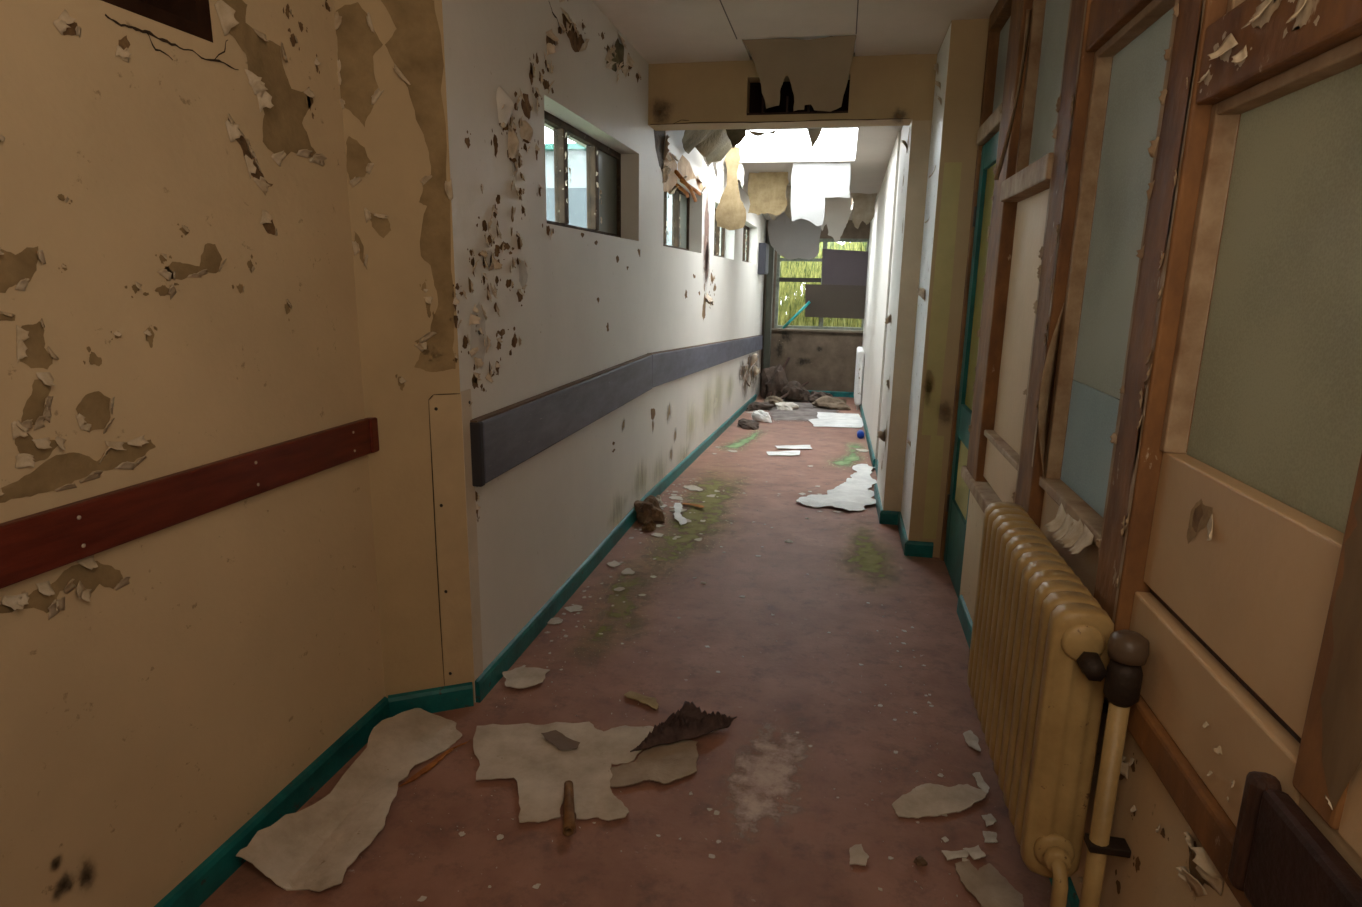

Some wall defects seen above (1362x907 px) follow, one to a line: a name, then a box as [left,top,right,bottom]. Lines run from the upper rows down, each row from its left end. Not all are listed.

peeling [0,246,67,293]
crack [105,14,239,70]
peeling [215,0,328,235]
peeling [322,0,642,407]
spalling [654,130,707,200]
peeling [0,311,157,503]